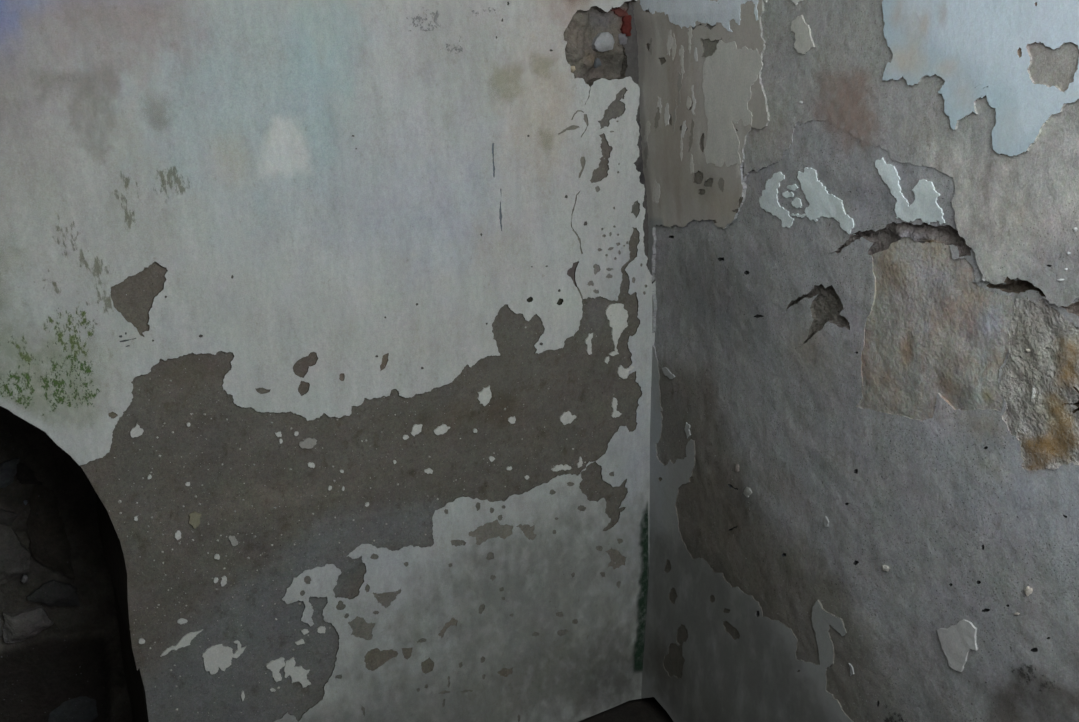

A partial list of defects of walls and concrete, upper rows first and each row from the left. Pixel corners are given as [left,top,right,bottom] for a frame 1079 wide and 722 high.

water stain [44,308,97,357]
spalling [80,227,642,722]
spalling [564,0,1079,722]